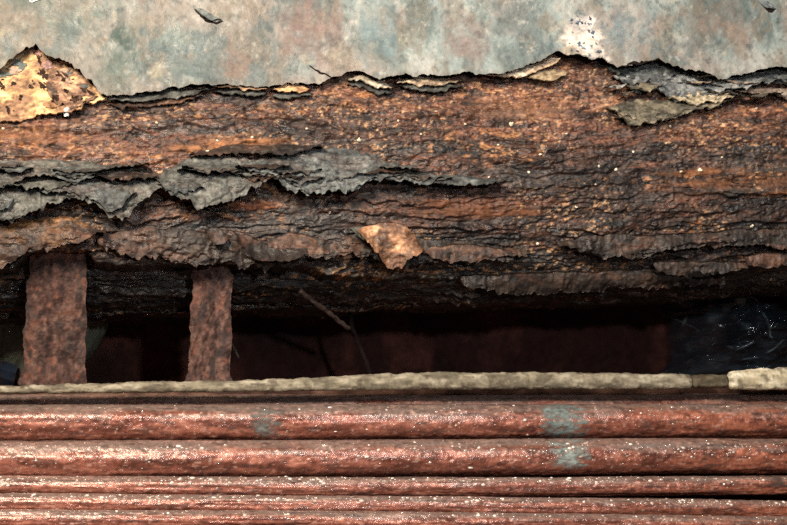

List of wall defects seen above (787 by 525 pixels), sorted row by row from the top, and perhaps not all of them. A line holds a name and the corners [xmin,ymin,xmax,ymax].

peeling [0,45,311,123]
peeling [478,15,787,126]
rust [210,138,271,154]
peeling [0,144,508,212]
rust [204,227,308,262]
rust [350,222,423,269]